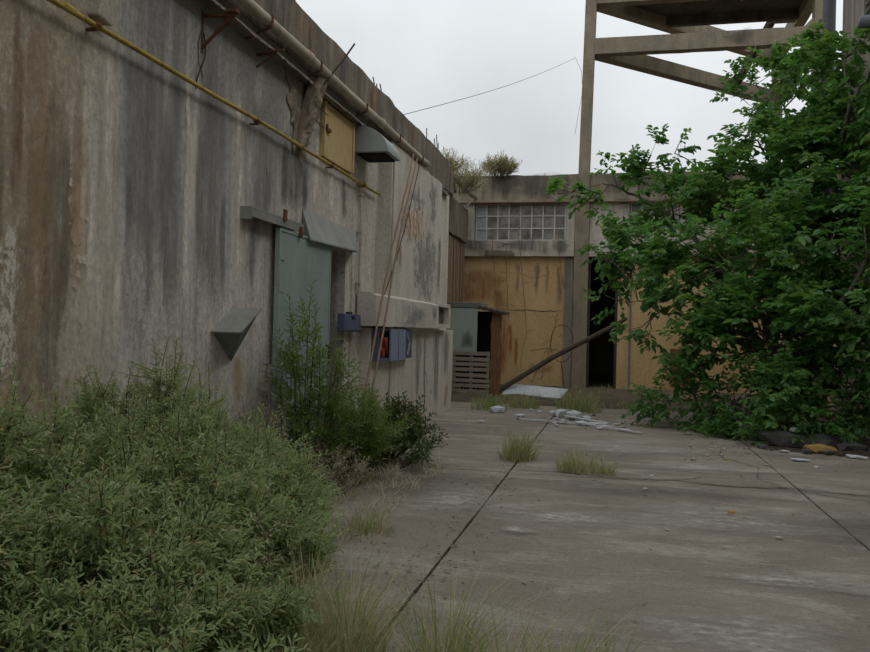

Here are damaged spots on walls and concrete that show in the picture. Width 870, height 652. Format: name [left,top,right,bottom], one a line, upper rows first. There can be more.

leakage [0,223,25,385]
peeling [68,160,92,300]
leakage [128,71,225,297]
leakage [236,101,270,276]
spalling [286,43,355,165]